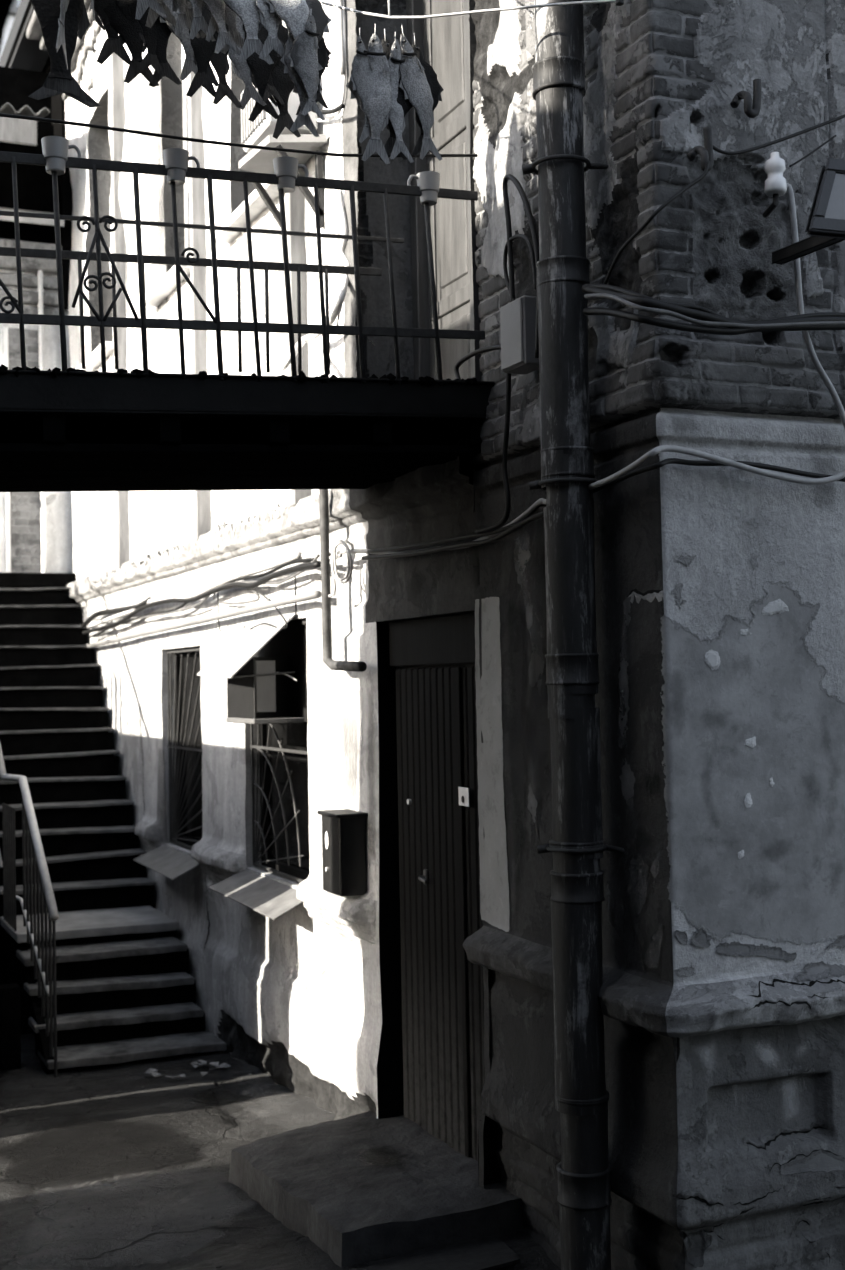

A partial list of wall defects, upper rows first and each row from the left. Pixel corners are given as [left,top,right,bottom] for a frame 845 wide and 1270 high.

flaking render [517,0,529,76]
flaking render [472,80,482,160]
flaking render [519,85,539,234]
flaking render [583,0,845,430]
flaking render [474,181,540,462]
peeling [606,561,845,982]
crack [671,1121,845,1263]